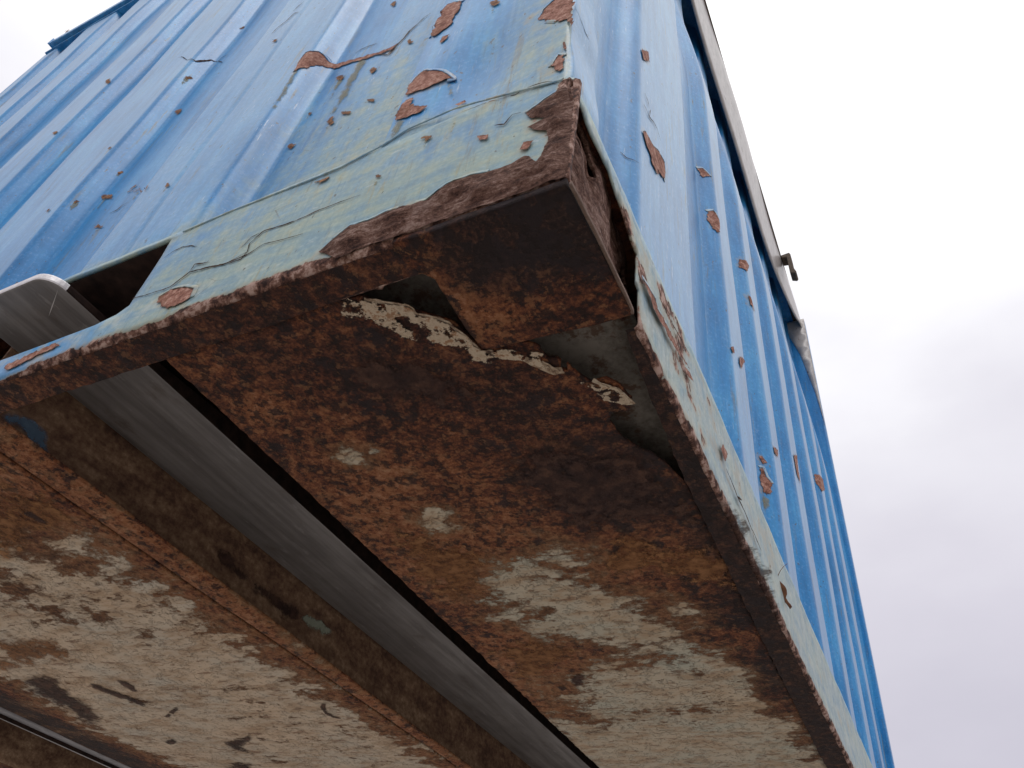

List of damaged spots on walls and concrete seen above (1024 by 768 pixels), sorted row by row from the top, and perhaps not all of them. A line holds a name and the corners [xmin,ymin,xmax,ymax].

peeling [429,0,464,43]
peeling [537,0,575,25]
peeling [273,45,396,111]
peeling [392,68,466,135]
peeling [643,130,666,182]
crack [132,195,359,299]
peeling [341,297,565,375]
rust [607,537,736,588]
rust [719,502,781,626]
rust [0,639,99,724]
rust [91,680,145,707]
rust [226,736,253,768]